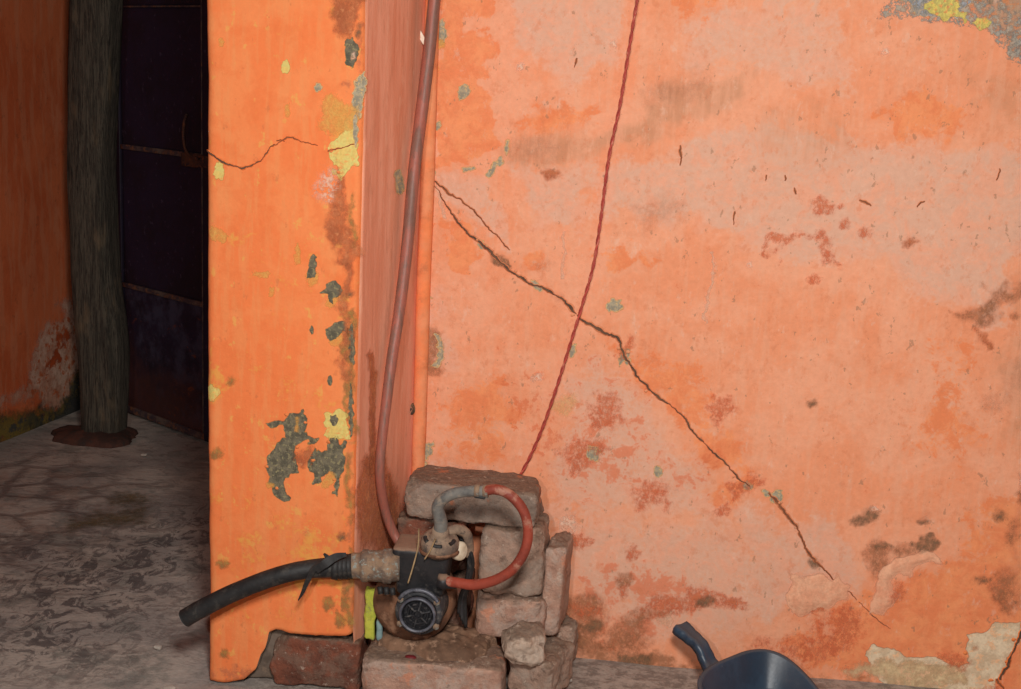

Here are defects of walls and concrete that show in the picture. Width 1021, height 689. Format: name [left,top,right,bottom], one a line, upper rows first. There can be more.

peeling [880,0,1020,57]
crack [207,136,354,170]
water stain [0,299,80,429]
peeling [265,310,360,508]
crack [435,180,891,629]
spalling [844,622,1021,689]